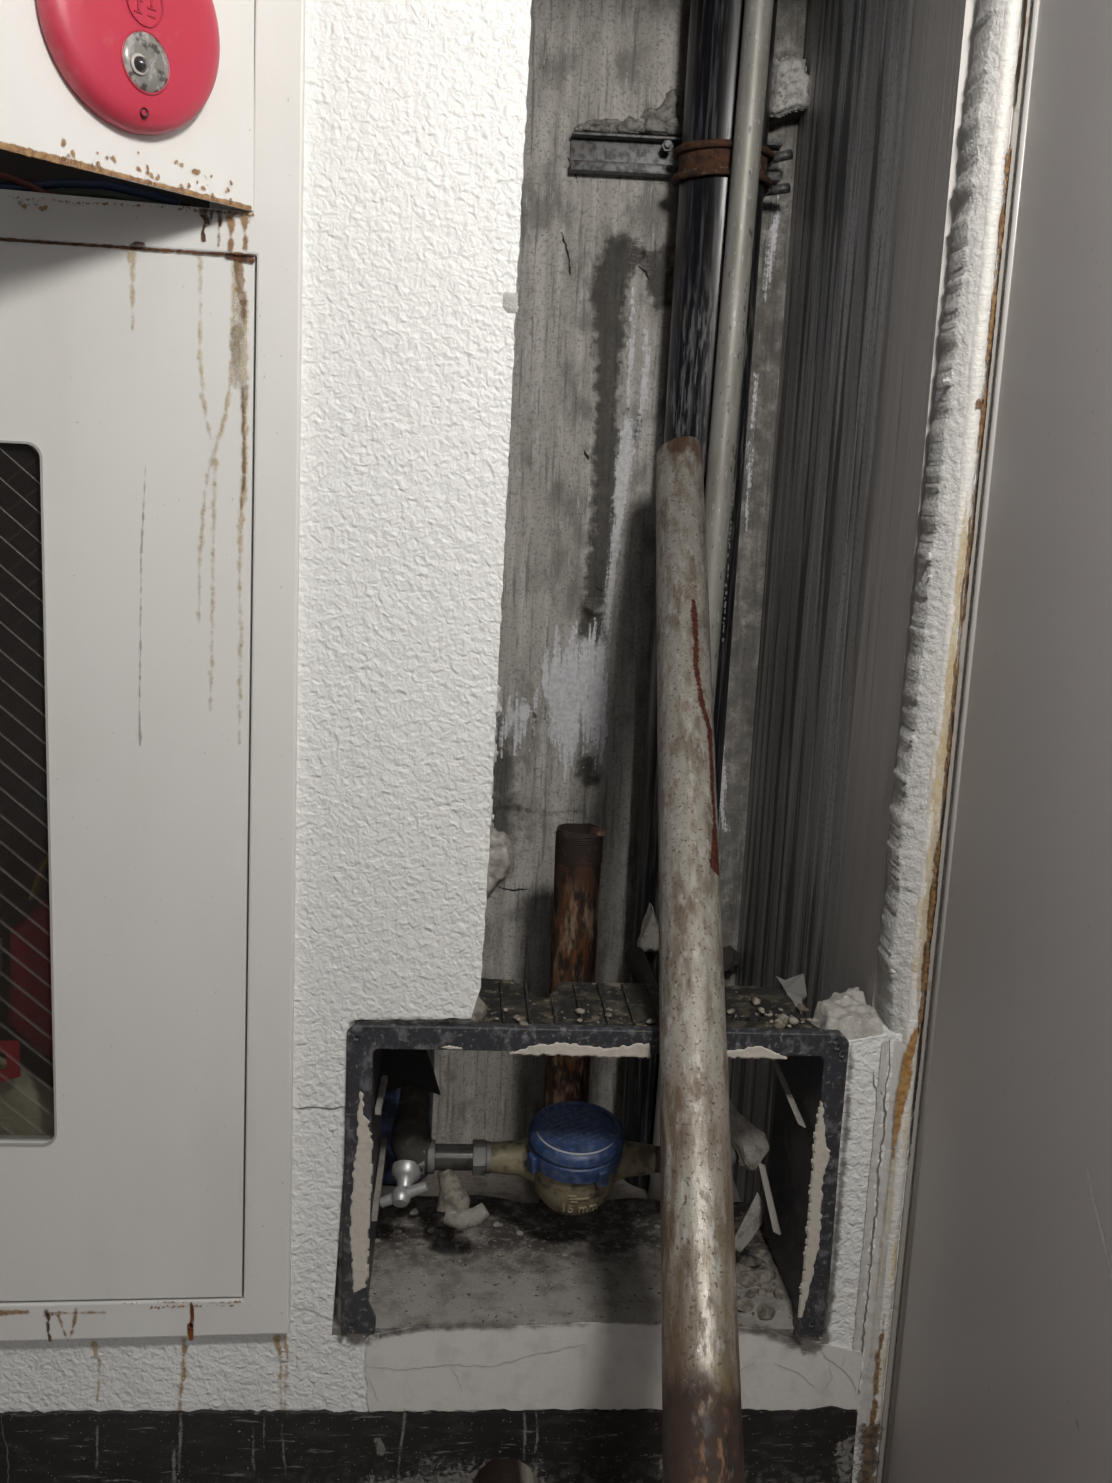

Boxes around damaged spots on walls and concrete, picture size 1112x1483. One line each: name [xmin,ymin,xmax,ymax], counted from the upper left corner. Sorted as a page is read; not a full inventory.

corrosion [975,145,1011,451]
water stain [492,236,673,832]
corrosion [878,491,975,1286]
corrosion [0,1309,95,1342]
corrosion [124,1301,202,1409]
corrosion [274,1335,288,1379]
corrosion [858,1314,885,1483]